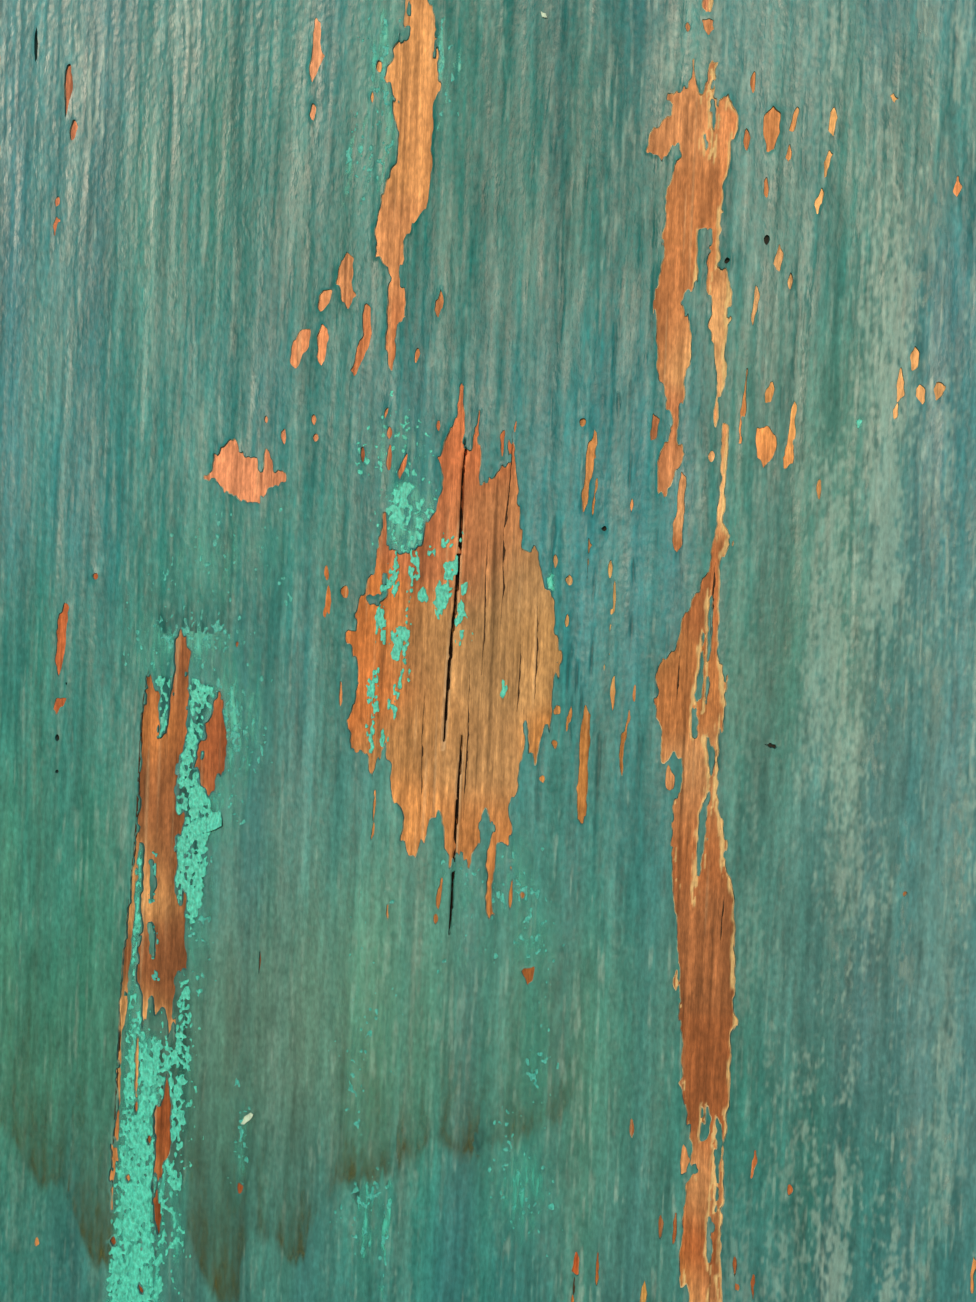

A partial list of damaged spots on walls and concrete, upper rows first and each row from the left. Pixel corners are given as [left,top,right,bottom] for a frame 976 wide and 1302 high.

peeling [290,0,461,376]
peeling [106,429,292,1302]
peeling [323,382,591,1003]
crack [420,439,513,935]
crack [517,606,539,708]
peeling [579,418,598,516]
peeling [608,560,616,631]
peeling [603,654,636,776]
peeling [646,59,800,1302]
peeling [328,992,378,1135]